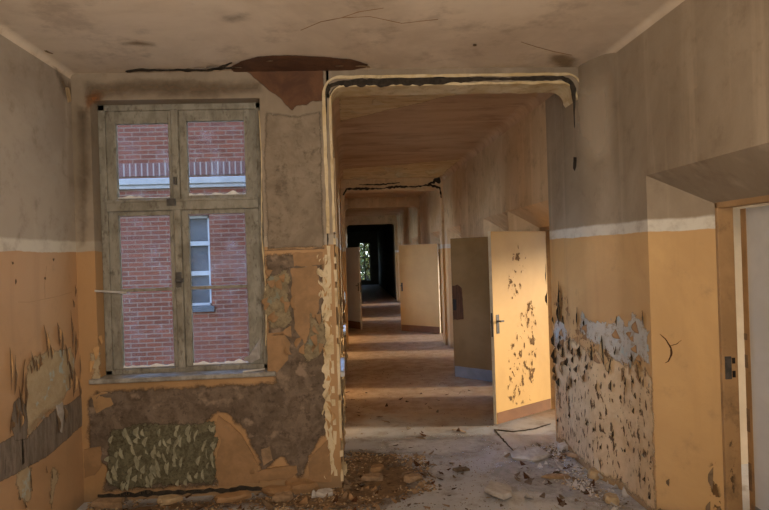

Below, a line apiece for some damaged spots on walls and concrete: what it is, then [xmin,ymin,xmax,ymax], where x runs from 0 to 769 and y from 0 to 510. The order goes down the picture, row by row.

crack [302,8,438,30]
spalling [0,55,370,508]
spalling [508,301,536,404]
peeling [545,282,661,510]
peeling [706,464,721,510]